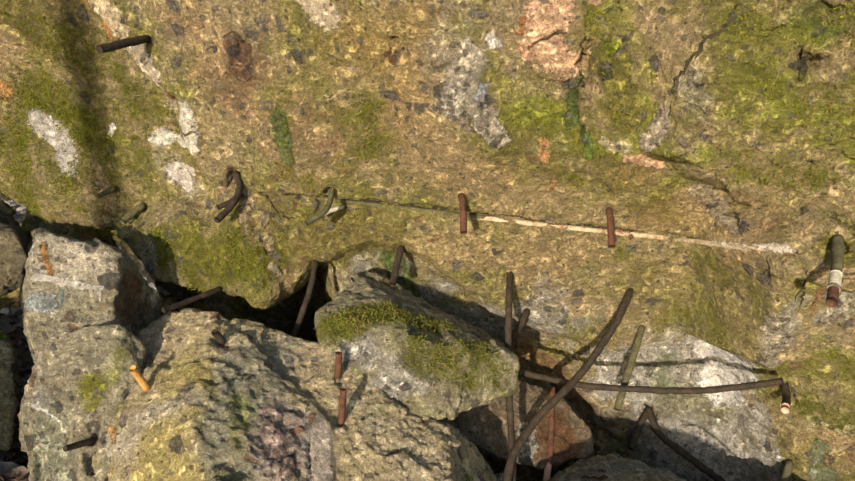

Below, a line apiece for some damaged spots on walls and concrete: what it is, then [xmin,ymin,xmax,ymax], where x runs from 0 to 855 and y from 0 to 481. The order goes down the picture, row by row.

crack [269,198,298,219]
crack [360,199,680,235]